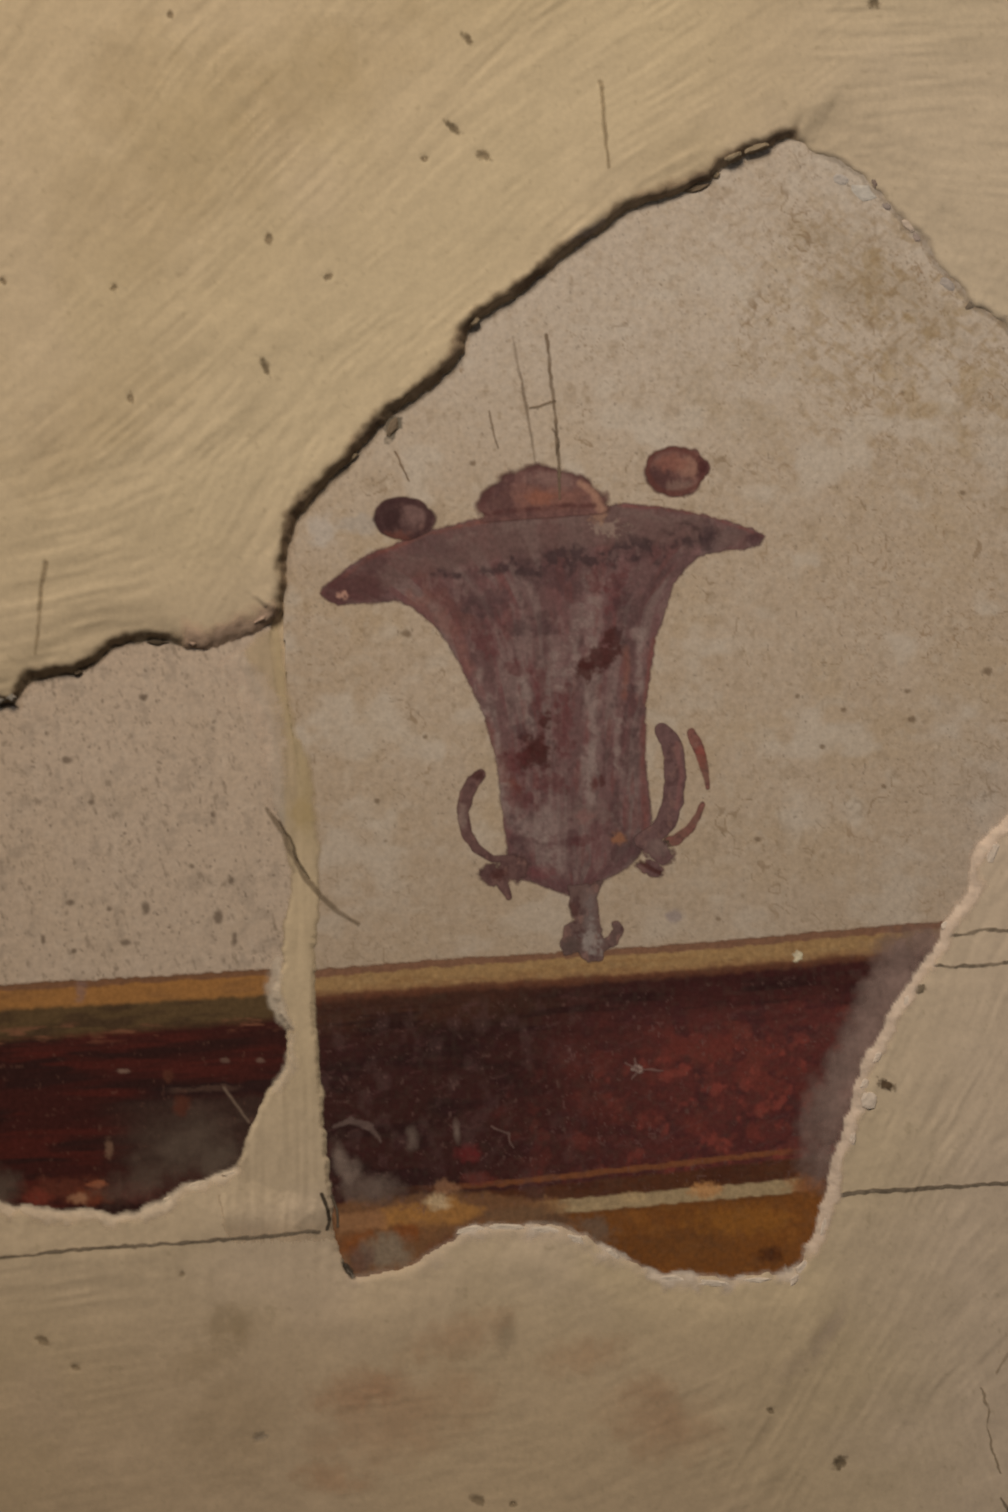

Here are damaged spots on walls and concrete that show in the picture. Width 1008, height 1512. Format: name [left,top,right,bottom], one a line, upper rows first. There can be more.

peeling [833,174,921,242]
spalling [0,130,796,704]
spalling [645,815,1008,1291]
spalling [0,1166,238,1226]
spalling [457,1223,629,1259]